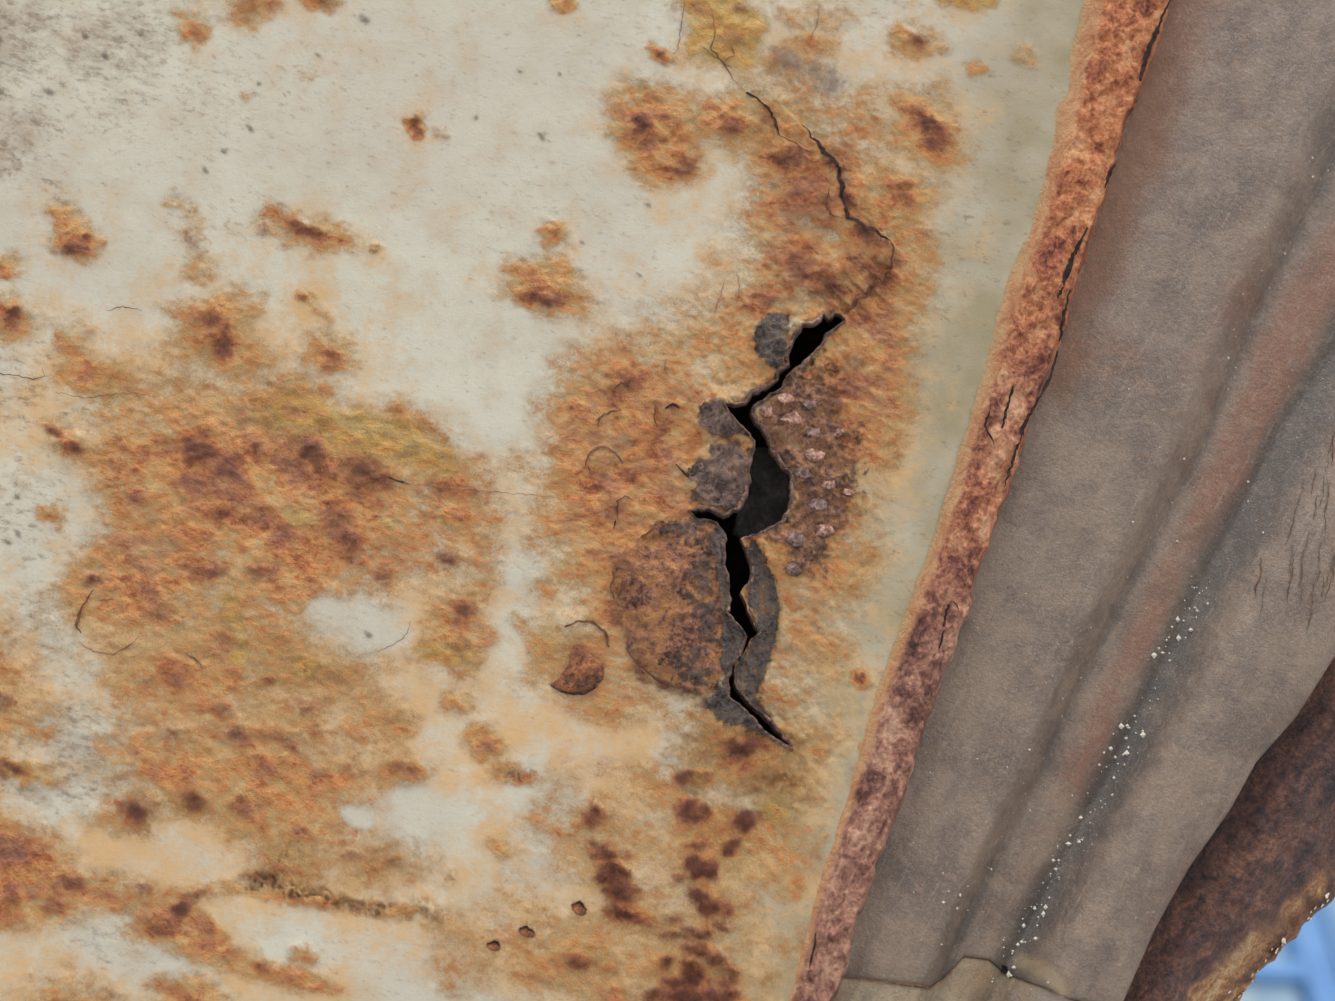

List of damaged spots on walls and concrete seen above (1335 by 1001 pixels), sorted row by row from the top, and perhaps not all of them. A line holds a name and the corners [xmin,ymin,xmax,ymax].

rust [937,0,996,12]
rust [966,62,988,76]
crack [1139,0,1171,81]
crack [1105,163,1115,188]
crack [585,3,895,750]
crack [984,227,1088,487]
rust [0,0,966,1001]